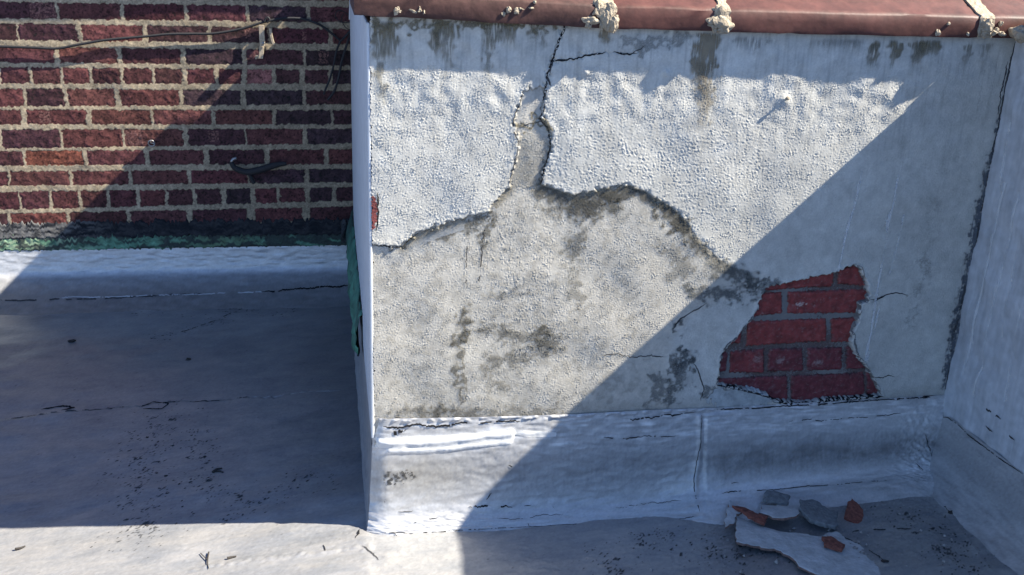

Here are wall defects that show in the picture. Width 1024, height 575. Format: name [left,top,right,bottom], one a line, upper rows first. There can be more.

damp [371,17,557,56]
damp [869,41,942,61]
crack [509,26,644,184]
spalling [371,193,379,230]
crack [602,44,1022,519]
spalling [706,264,883,408]
damp [451,308,473,411]
damp [654,346,696,405]
crack [383,420,520,435]
crack [384,495,571,536]
spalling [732,505,768,526]
crack [842,528,911,560]